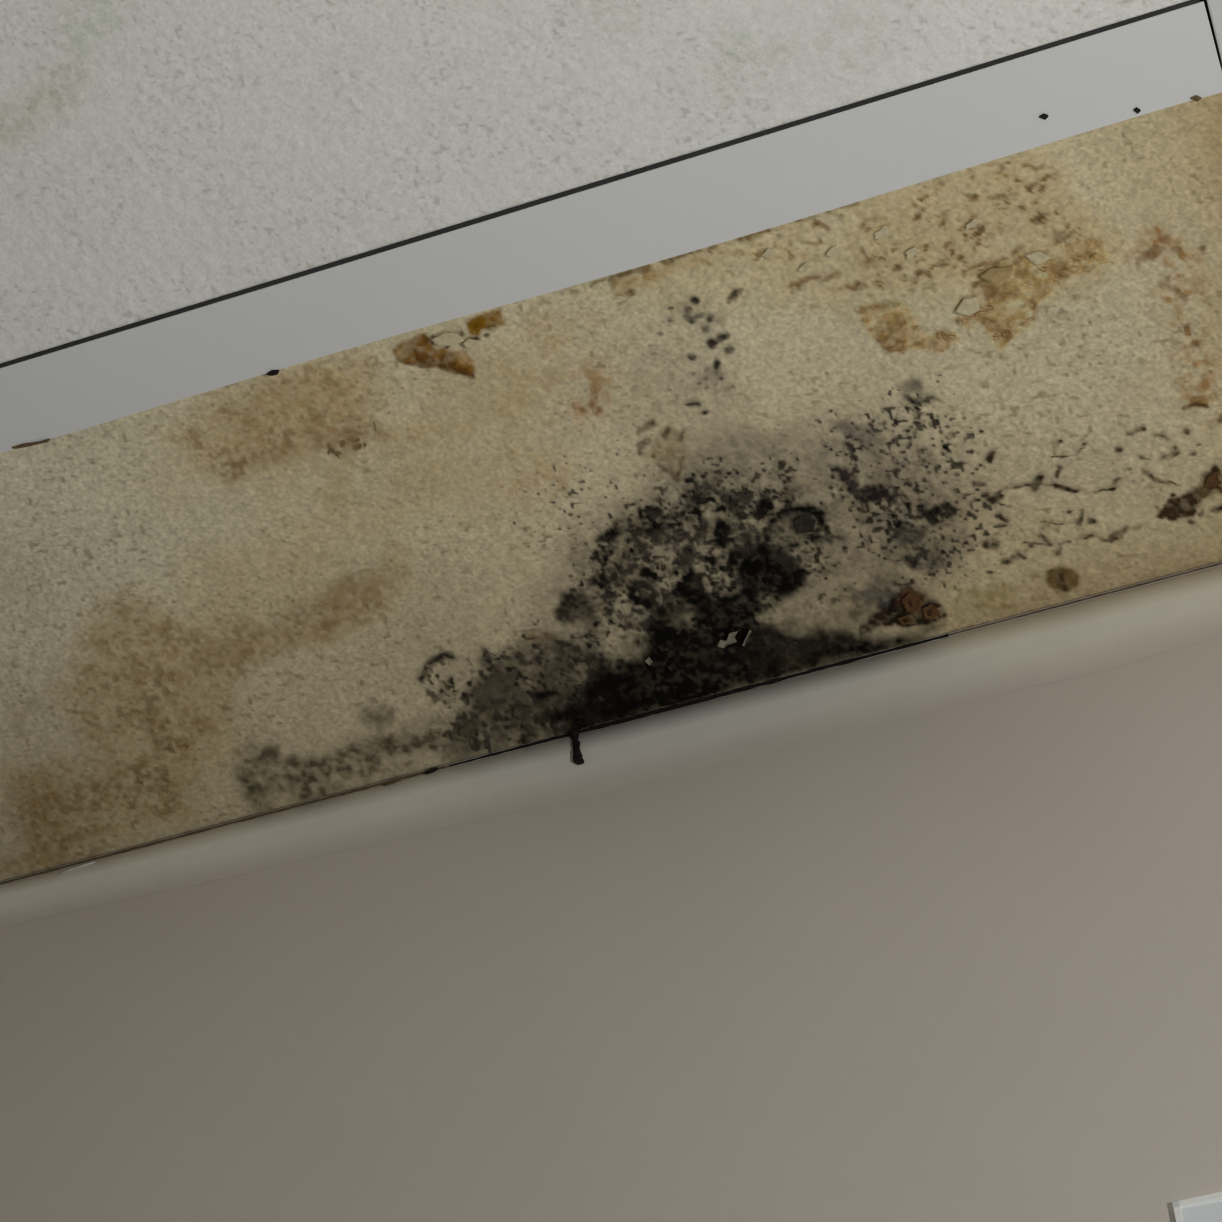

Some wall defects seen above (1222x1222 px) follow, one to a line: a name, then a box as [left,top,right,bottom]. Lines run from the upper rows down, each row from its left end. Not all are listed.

damp [660,297,734,387]
peeling [753,247,833,294]
peeling [861,162,1109,352]
damp [0,380,1222,885]